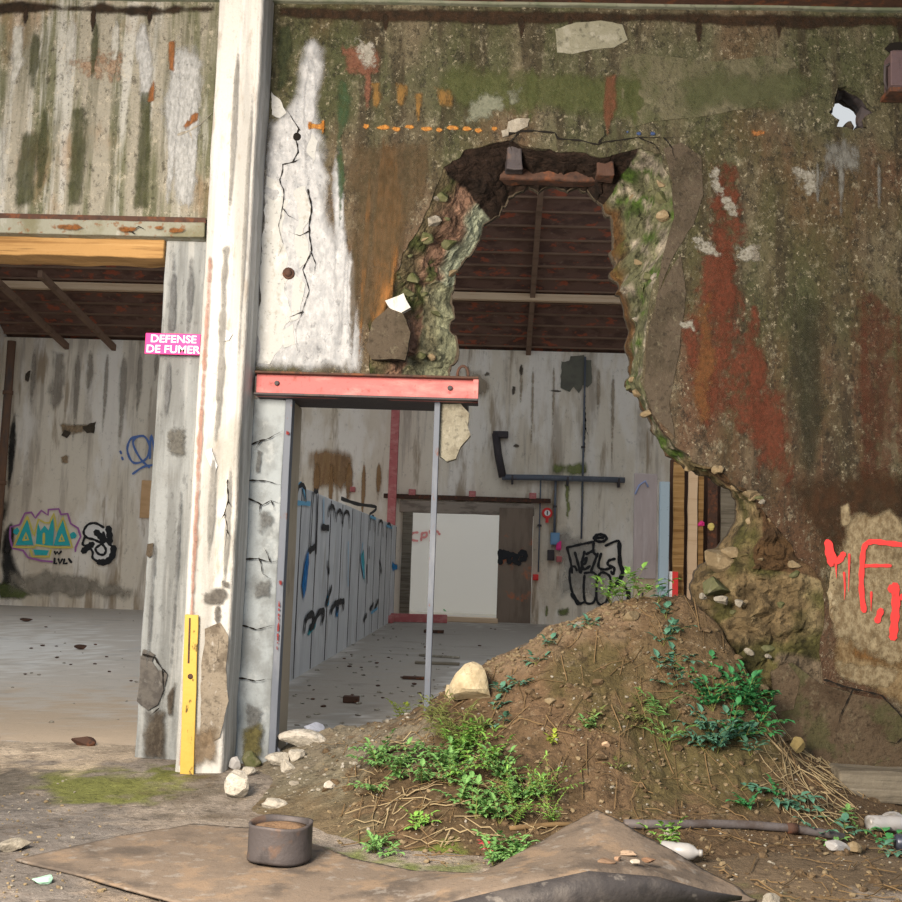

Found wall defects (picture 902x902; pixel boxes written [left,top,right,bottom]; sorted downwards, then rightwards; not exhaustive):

leakage [0,1,213,208]
crack [278,109,316,351]
corrosion [360,243,398,330]
spalling [366,118,902,767]
crack [221,479,279,550]
crack [246,548,275,578]
spalling [137,649,168,710]
spalling [200,623,229,740]